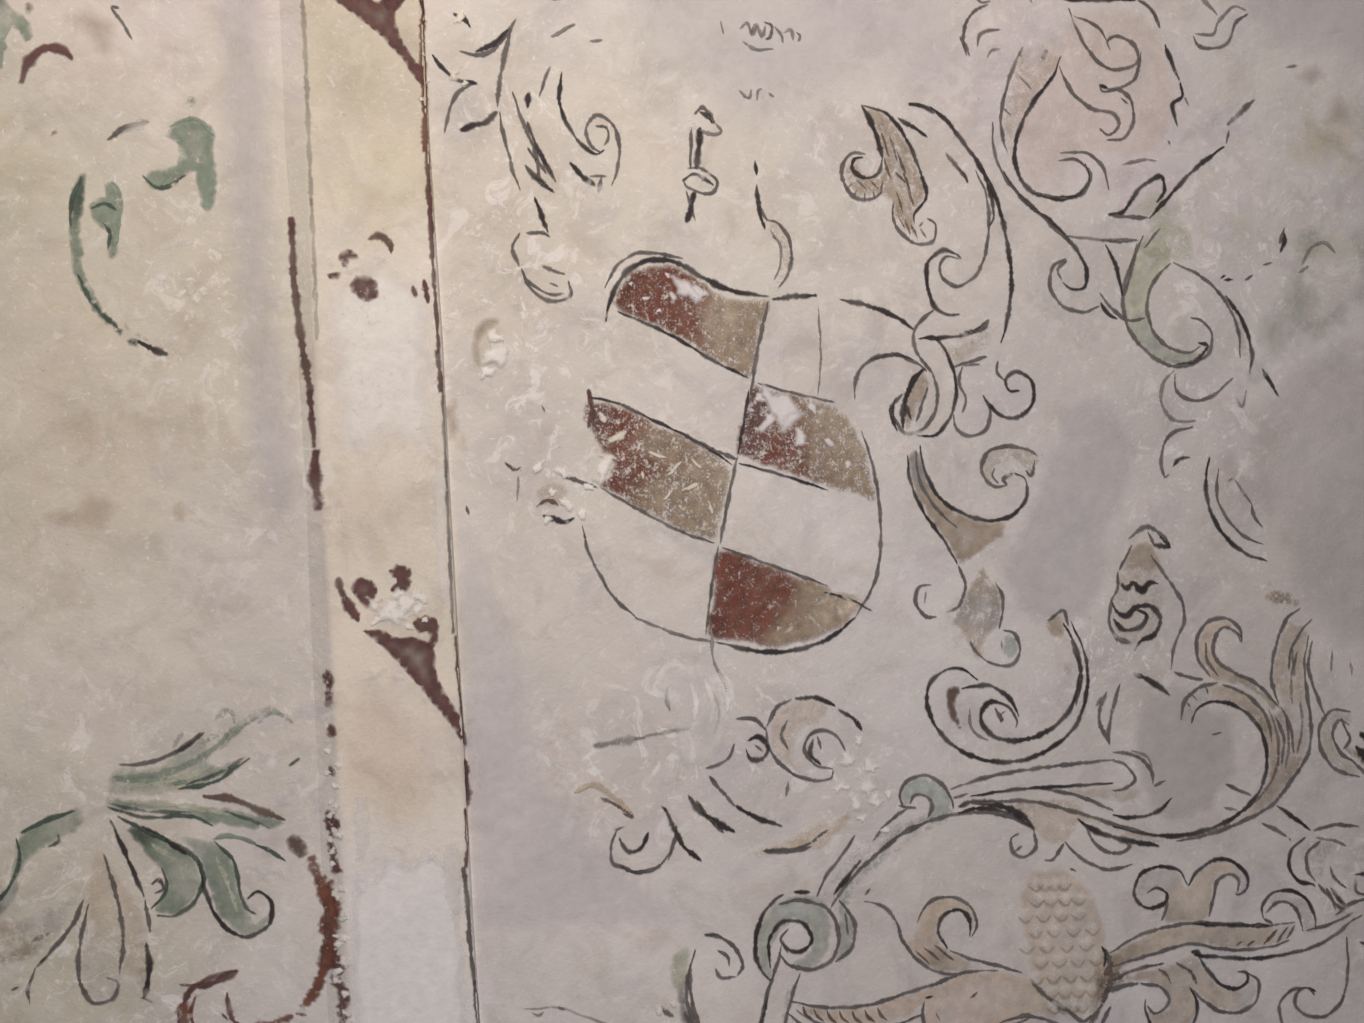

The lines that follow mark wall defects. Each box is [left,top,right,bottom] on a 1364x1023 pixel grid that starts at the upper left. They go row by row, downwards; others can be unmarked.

peeling [323,671,333,706]
peeling [319,725,465,1023]